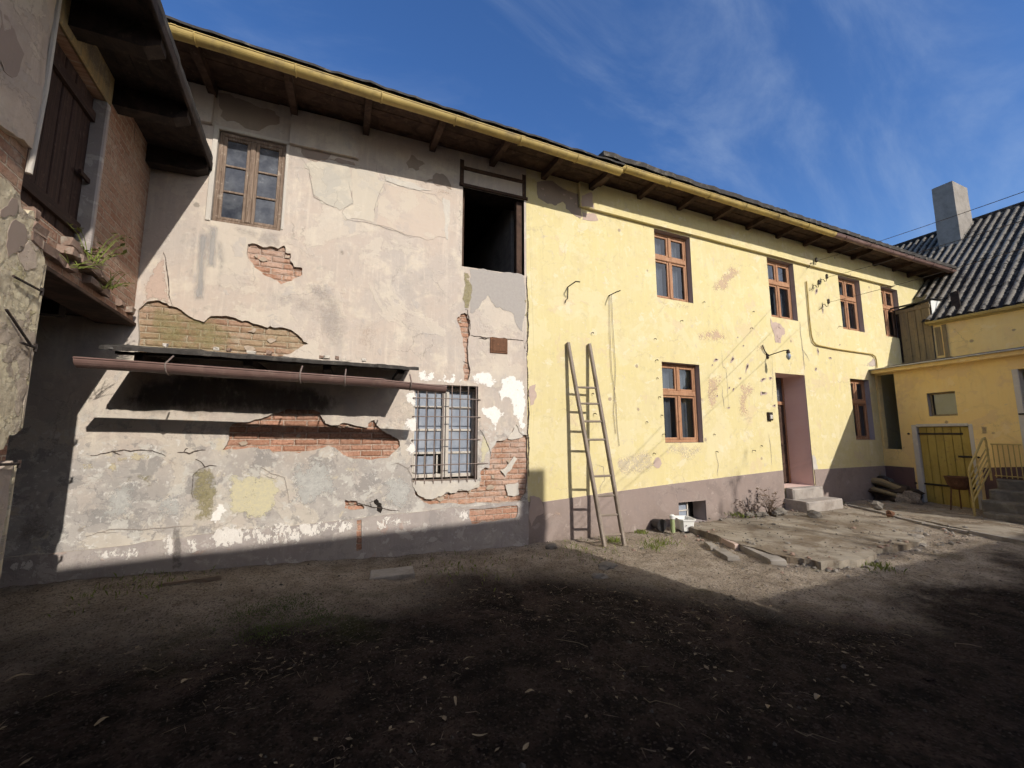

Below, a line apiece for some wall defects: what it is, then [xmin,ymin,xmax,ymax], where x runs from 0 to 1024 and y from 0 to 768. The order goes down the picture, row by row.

crack [300,157,440,237]
spalling [247,244,302,284]
spalling [139,301,307,357]
spalling [457,313,470,381]
spalling [224,410,400,460]
crack [90,448,215,497]
water stain [193,469,217,519]
spalling [413,425,544,526]
spalling [345,499,383,551]